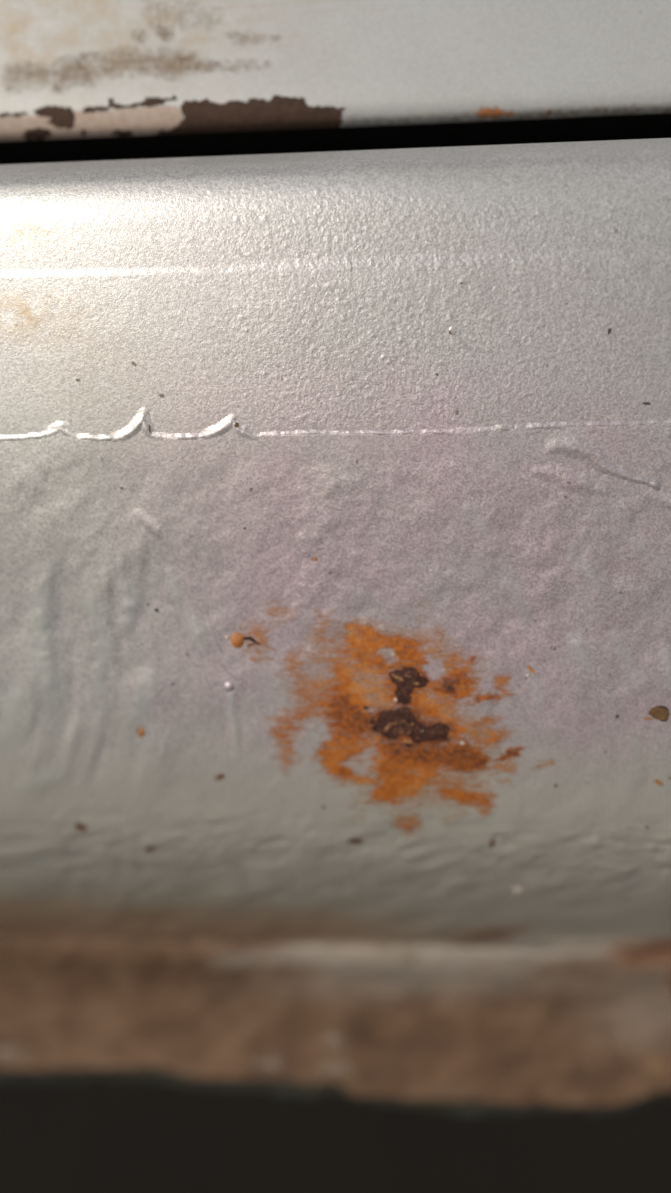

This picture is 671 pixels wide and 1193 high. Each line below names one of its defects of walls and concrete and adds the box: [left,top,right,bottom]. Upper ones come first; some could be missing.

peeling [0,95,345,141]
rust [273,620,524,816]